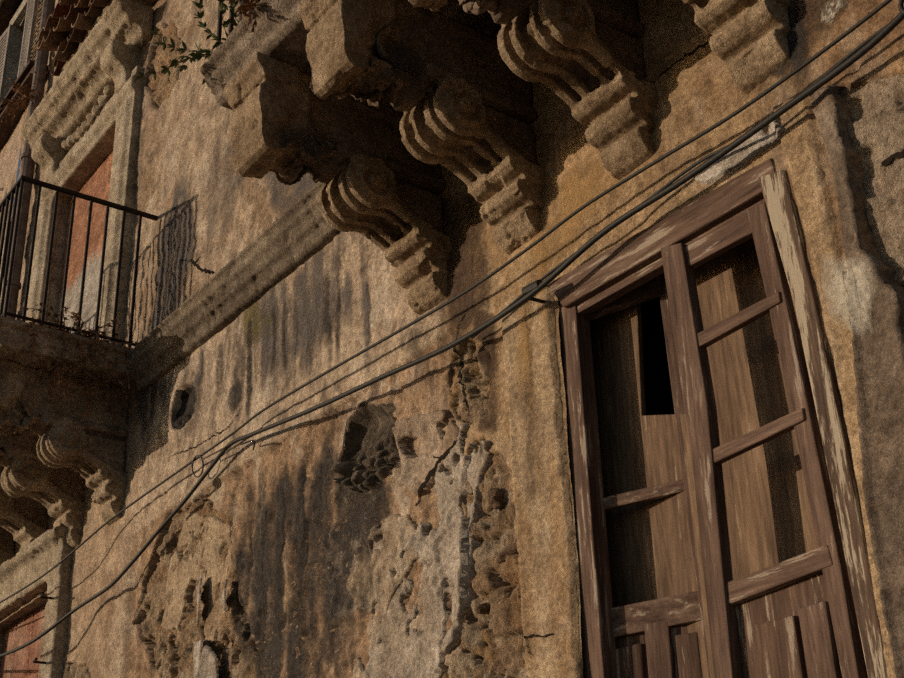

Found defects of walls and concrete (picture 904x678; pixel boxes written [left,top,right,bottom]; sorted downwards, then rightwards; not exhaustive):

spalling [840,73,904,286]
leakage [229,250,351,415]
leakage [362,282,370,359]
crack [453,311,470,416]
spalling [132,497,266,678]
leakage [235,434,389,678]
crack [415,440,455,506]
peeling [346,341,529,678]